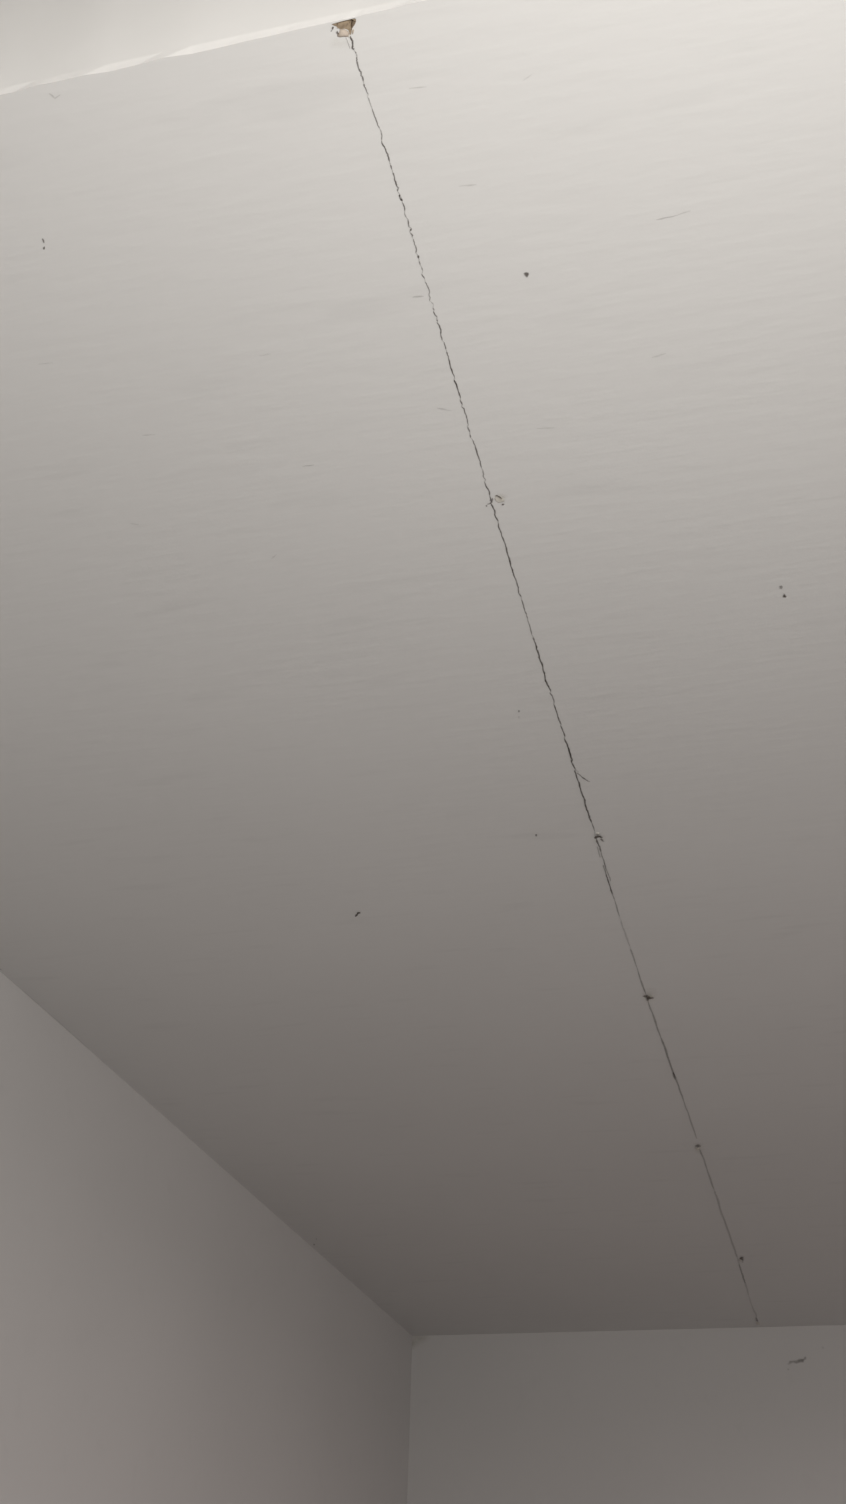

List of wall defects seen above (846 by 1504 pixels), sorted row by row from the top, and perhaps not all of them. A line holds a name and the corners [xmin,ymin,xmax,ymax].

spalling [332,19,356,37]
crack [350,36,612,892]